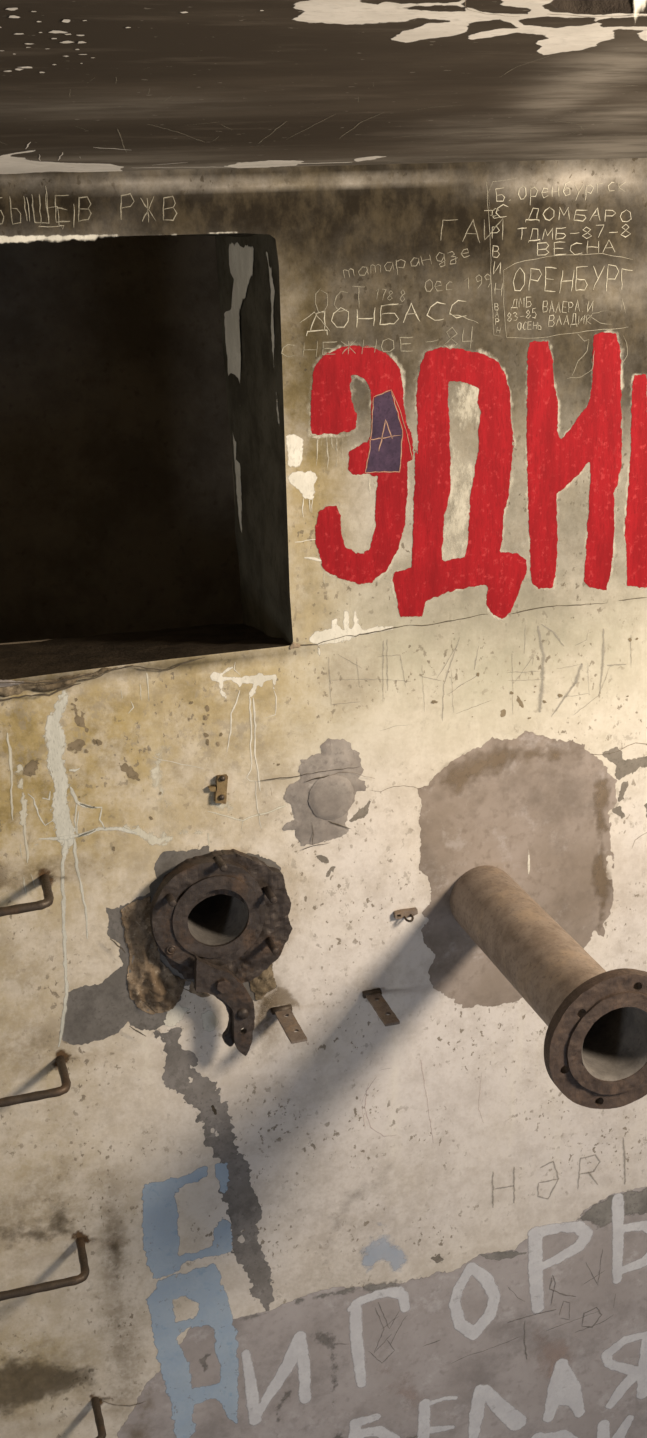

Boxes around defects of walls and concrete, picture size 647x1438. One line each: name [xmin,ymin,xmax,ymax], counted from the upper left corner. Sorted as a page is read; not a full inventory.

spalling [551,0,647,17]
water stain [7,691,210,1047]
water stain [208,665,286,828]
peeling [349,801,371,822]